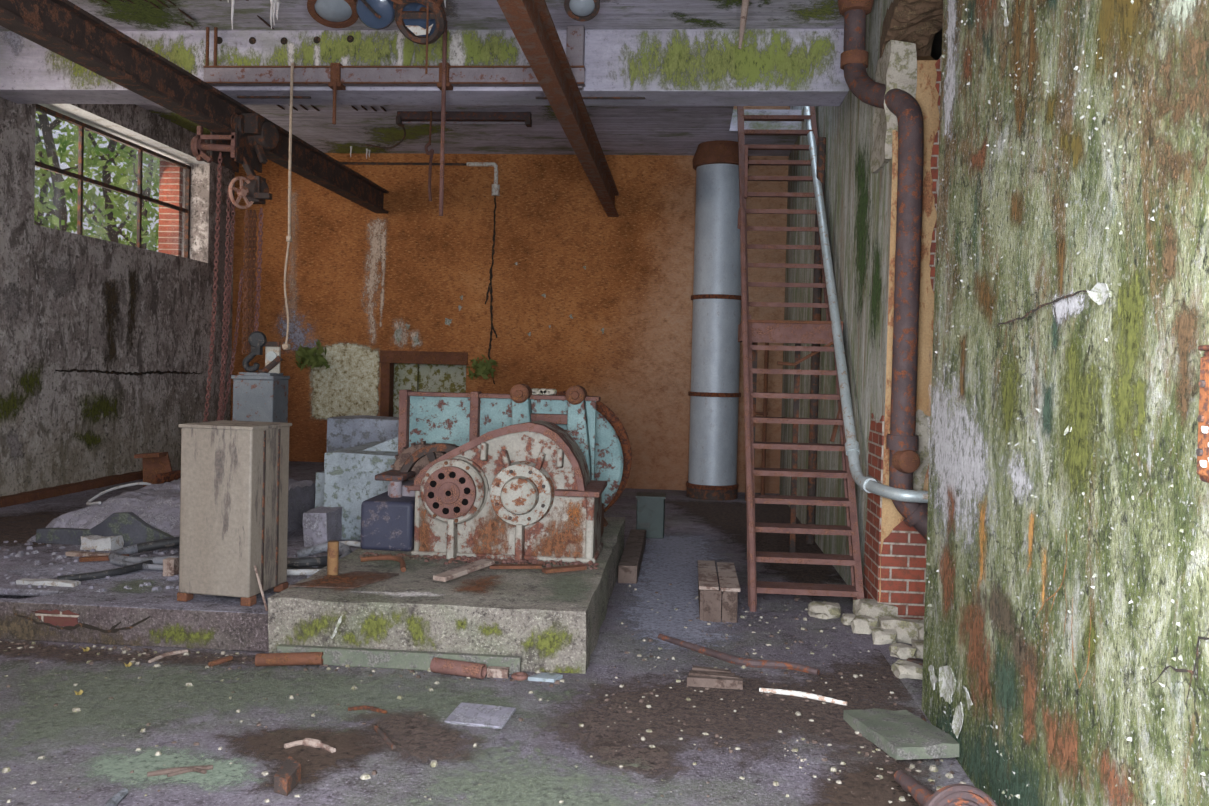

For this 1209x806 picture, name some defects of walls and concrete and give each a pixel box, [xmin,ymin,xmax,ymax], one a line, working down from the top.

efflorescence [361,220,386,343]
crack [55,368,202,376]
rust [939,488,1000,726]
peeling [983,706,1034,801]
rust [1020,641,1085,785]
crack [1152,636,1209,705]